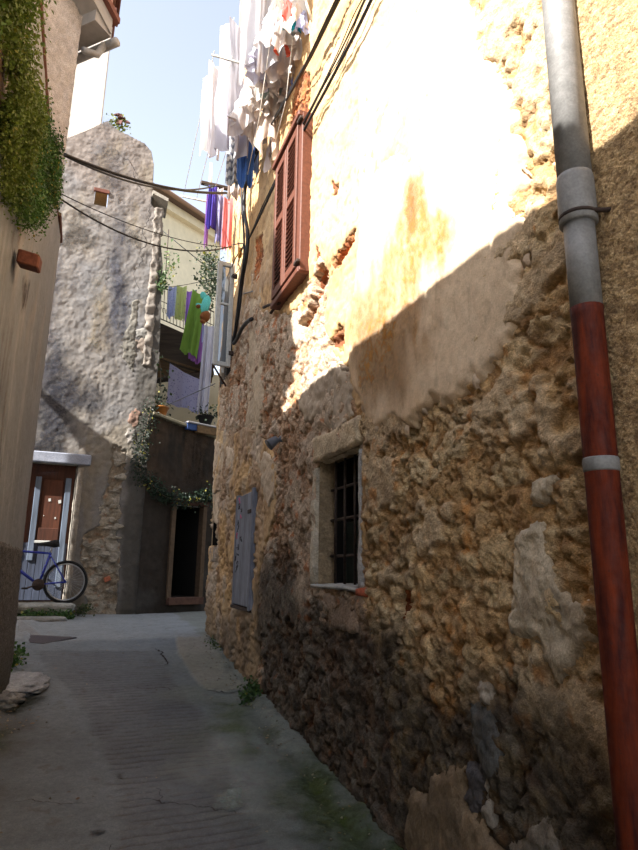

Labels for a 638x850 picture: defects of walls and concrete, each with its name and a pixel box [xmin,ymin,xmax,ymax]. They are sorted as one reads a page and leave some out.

crack [114,148,152,288]
damp [350,177,448,389]
damp [34,354,98,452]
spalling [219,0,616,850]